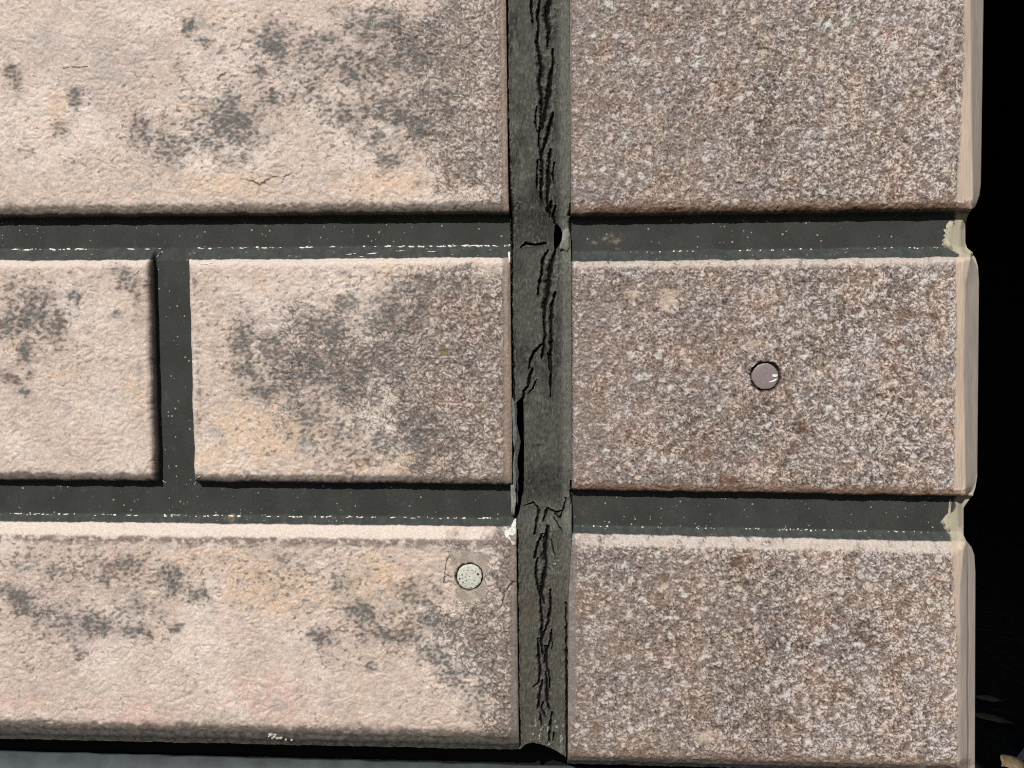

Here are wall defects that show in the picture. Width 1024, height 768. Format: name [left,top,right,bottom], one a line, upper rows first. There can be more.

water stain [130,2,463,168]
crack [507,0,571,400]
water stain [0,282,81,398]
water stain [223,275,436,450]
water stain [371,414,433,459]
water stain [0,568,161,660]
water stain [103,552,150,584]
water stain [160,566,209,603]
water stain [306,627,332,645]
water stain [345,577,488,718]
crack [501,480,572,755]